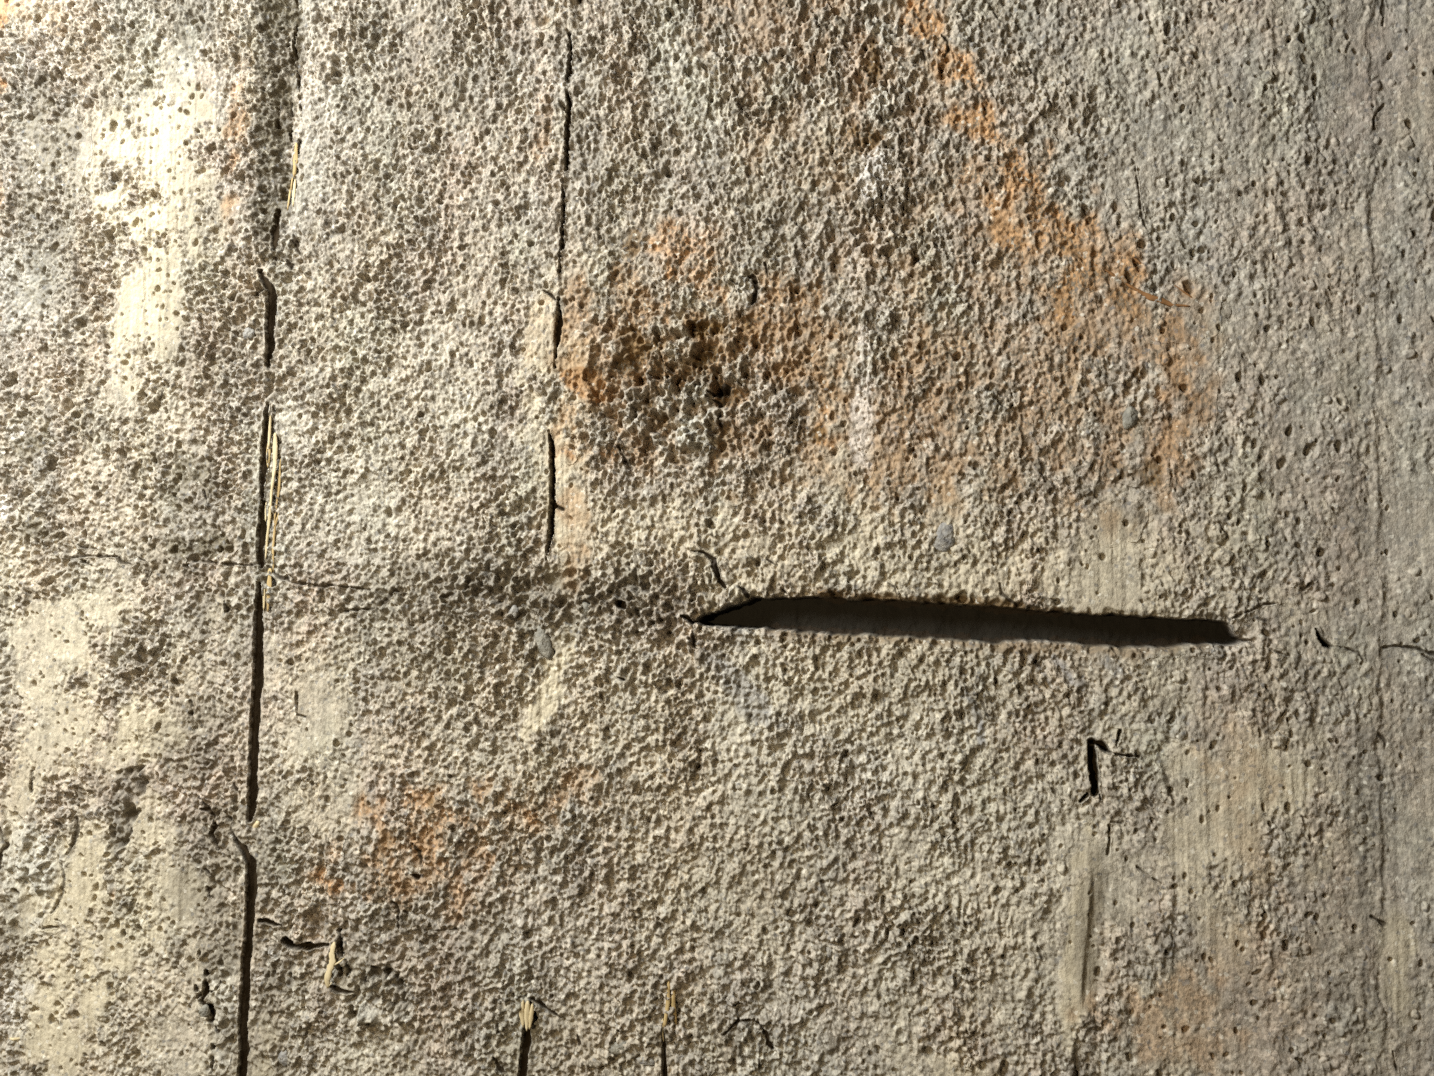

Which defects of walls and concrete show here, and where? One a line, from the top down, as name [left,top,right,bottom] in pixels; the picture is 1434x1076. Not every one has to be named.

crack [274,0,303,164]
crack [542,0,583,369]
corrosion [519,0,1235,572]
crack [544,429,566,562]
crack [70,208,474,1076]
crack [997,574,1058,603]
corrosion [300,762,606,928]
crack [492,993,563,1076]
crack [649,1023,669,1076]